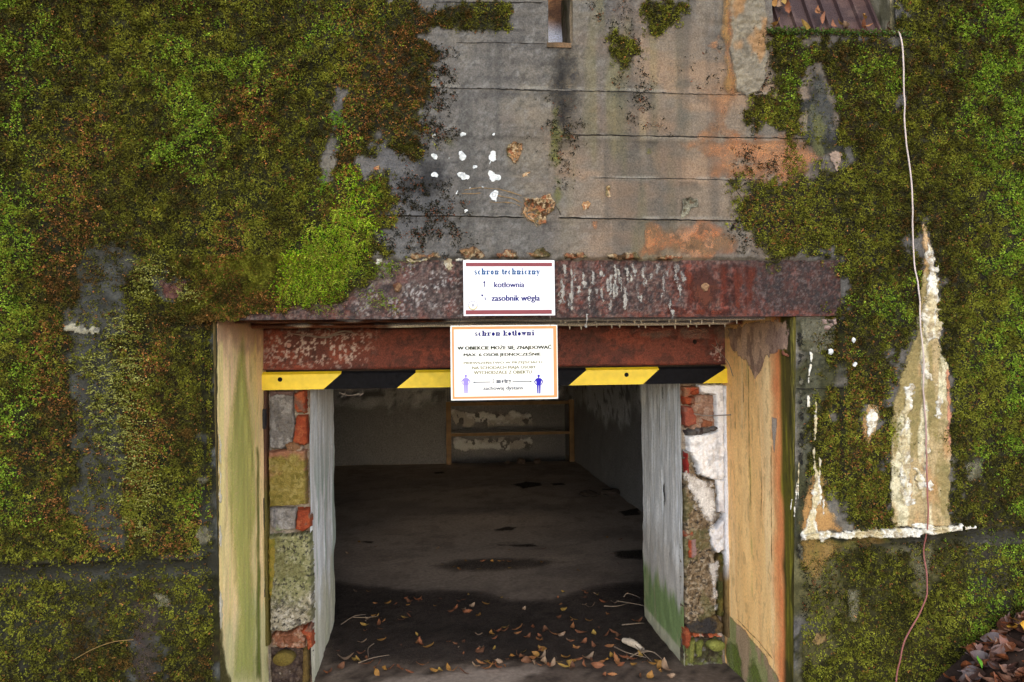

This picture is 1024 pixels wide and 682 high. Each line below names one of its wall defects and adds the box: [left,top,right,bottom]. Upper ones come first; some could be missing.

spalling [506,141,530,177]
spalling [521,192,555,227]
rust [642,223,737,308]
peeling [728,317,837,465]
peeling [680,389,725,649]